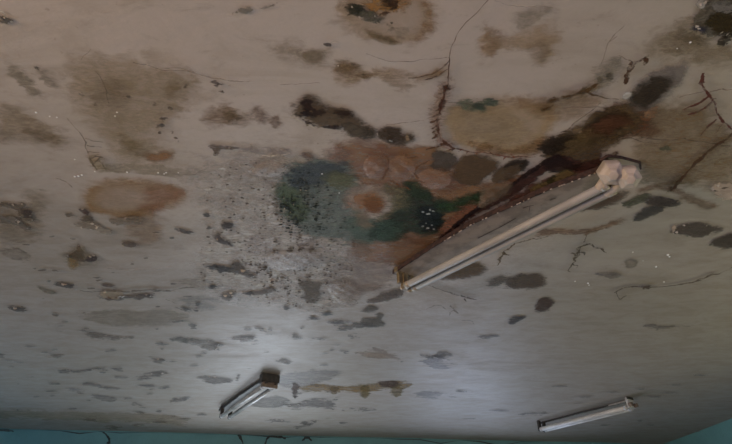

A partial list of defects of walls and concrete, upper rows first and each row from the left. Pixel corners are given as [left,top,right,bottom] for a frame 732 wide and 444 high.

damp [344,0,409,24]
crack [340,0,531,190]
crack [651,73,732,192]
damp [273,65,732,266]
crack [498,227,607,272]
damp [442,263,546,289]
crack [614,273,720,300]
damp [279,371,413,398]